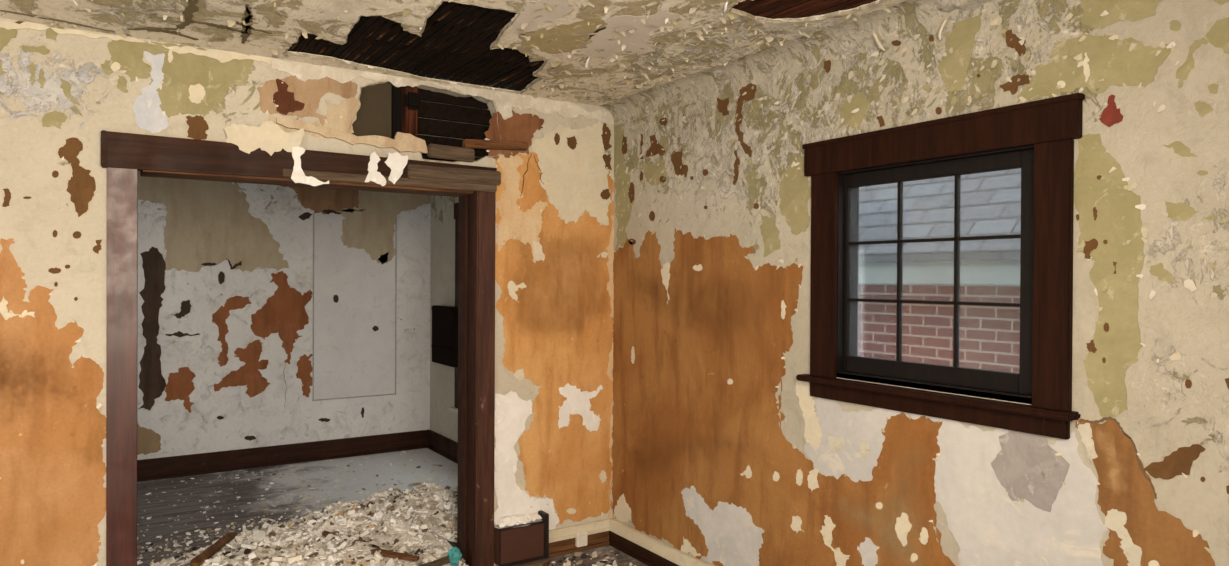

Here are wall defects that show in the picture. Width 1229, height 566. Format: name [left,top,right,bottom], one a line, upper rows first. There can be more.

peeling [149,0,197,32]
peeling [774,51,897,134]
peeling [892,0,1175,127]
peeling [1175,17,1229,88]
peeling [1165,202,1228,223]
peeling [137,171,313,455]
peeling [224,75,1218,566]
peeling [0,238,106,566]